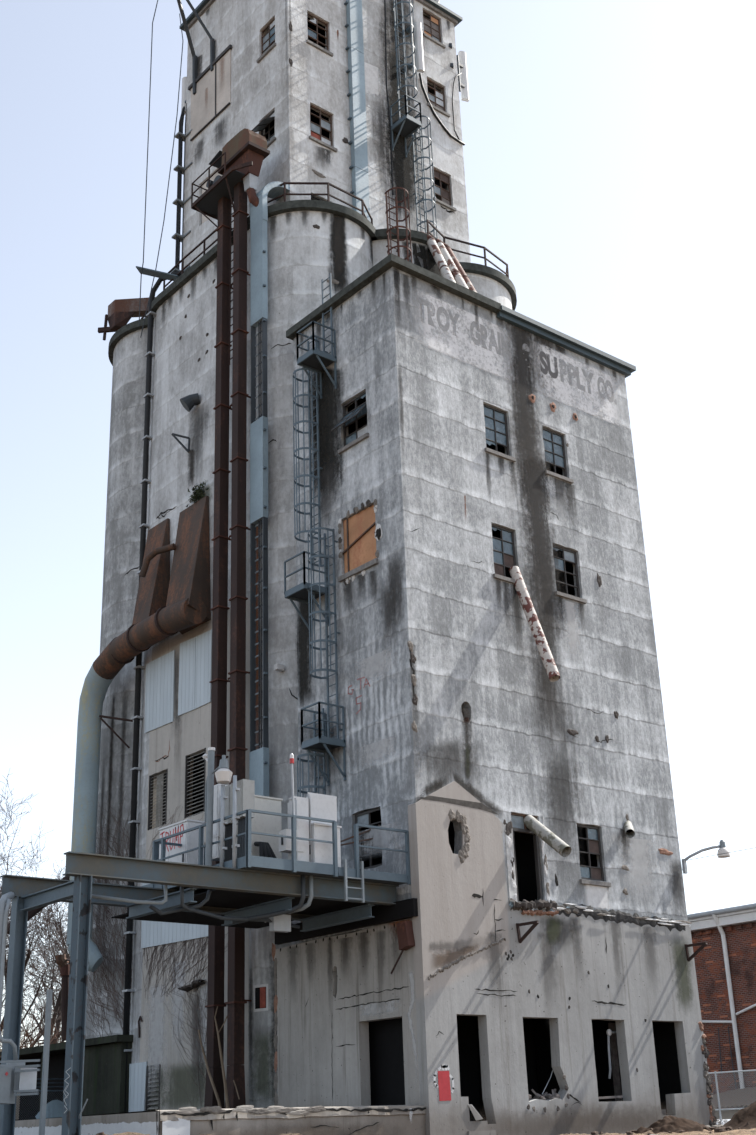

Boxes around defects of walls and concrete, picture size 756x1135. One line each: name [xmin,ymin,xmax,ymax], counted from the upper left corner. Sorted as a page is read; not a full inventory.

water stain [373,0,417,213]
water stain [317,212,347,335]
water stain [462,298,583,739]
water stain [548,768,577,836]
spalling [448,809,471,864]
water stain [546,920,572,940]
peeling [645,918,693,926]
water stain [675,946,690,1000]
spalling [527,1074,570,1113]